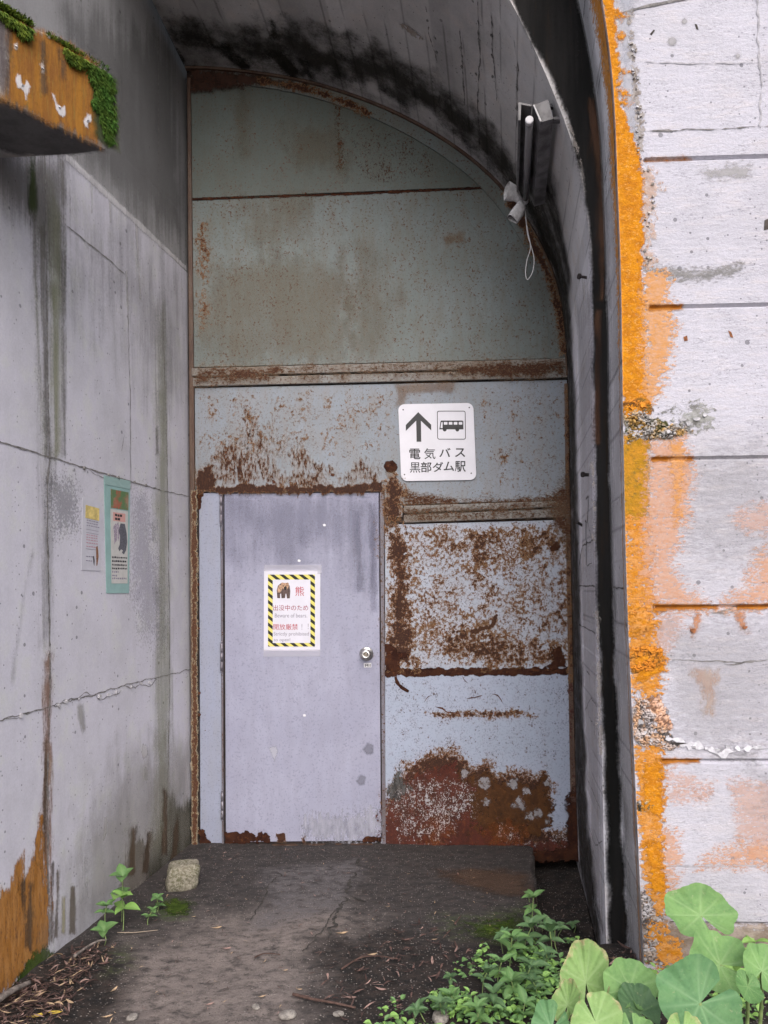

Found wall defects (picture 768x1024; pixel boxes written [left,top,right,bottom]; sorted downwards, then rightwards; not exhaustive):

spalling [623,396,720,444]
leakage [168,0,629,945]
corrosion [190,192,579,863]
crack [0,669,190,721]
spalling [632,692,768,759]
corrosion [0,658,54,993]
leakage [121,790,191,892]
leakage [51,863,76,937]